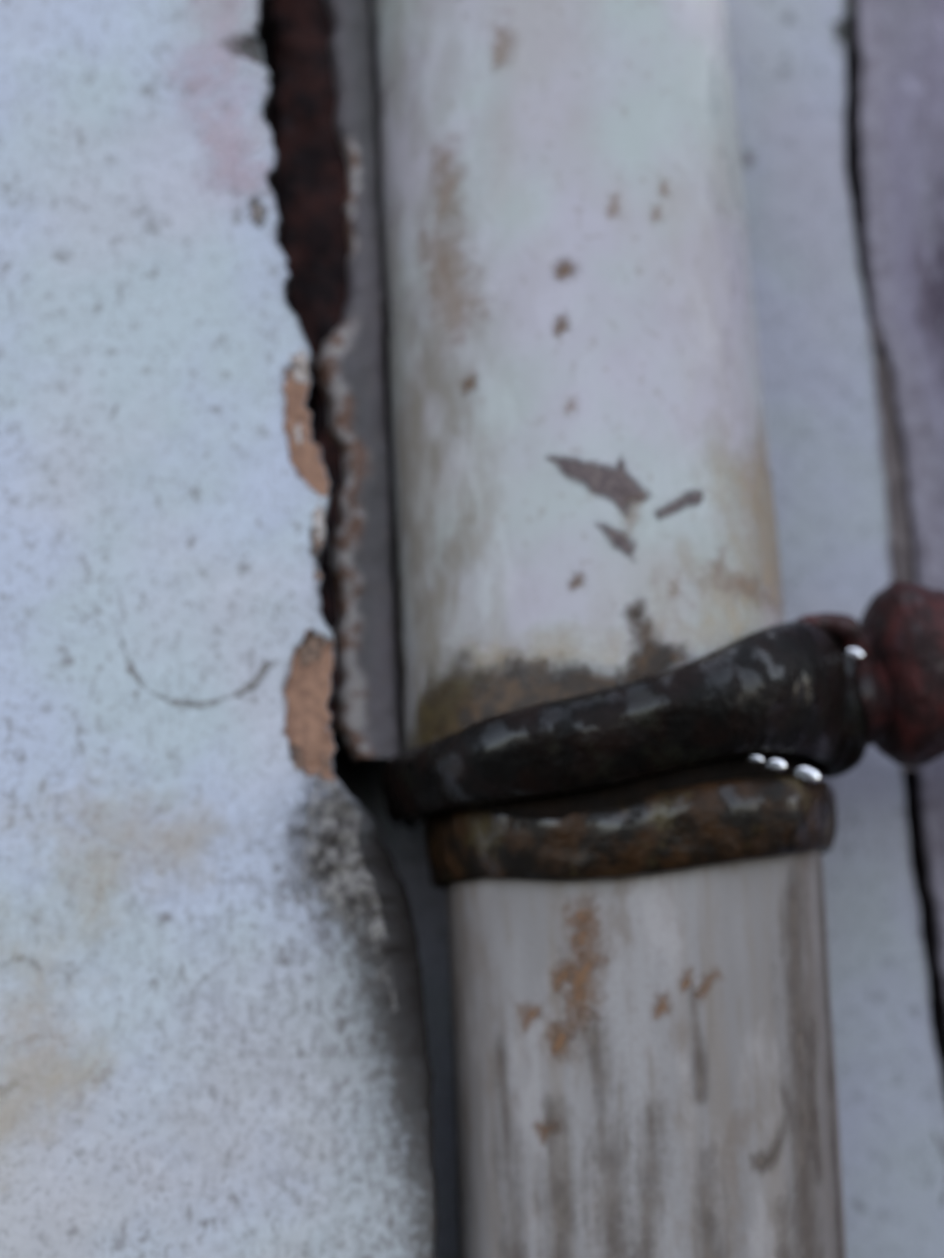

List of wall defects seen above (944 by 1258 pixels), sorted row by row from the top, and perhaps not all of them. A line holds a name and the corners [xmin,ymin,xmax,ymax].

peeling [249,199,266,228]
spalling [282,349,329,581]
crack [868,320,913,583]